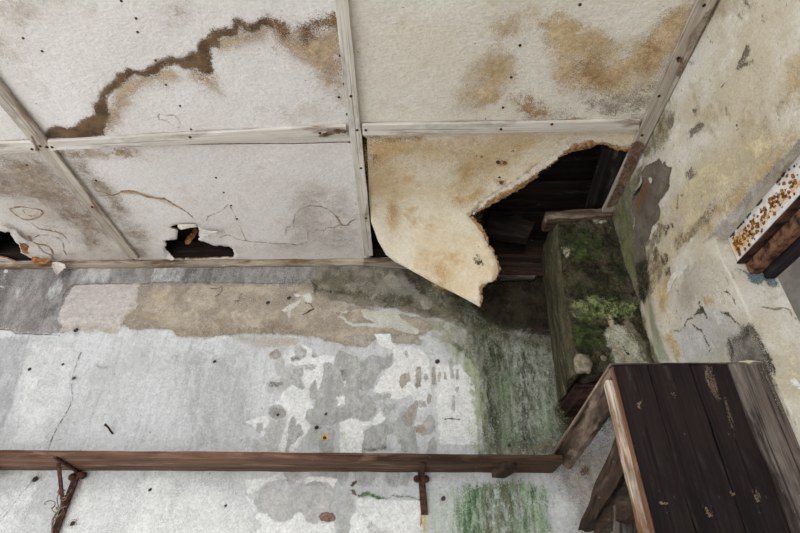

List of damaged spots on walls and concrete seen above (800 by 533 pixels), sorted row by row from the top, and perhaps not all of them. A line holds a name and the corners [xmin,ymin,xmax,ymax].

damp [44,0,346,139]
damp [444,0,695,120]
peeling [0,225,66,275]
peeling [178,224,218,238]
peeling [606,140,741,363]
peeling [252,333,437,454]
peeling [399,358,460,412]
damp [726,306,800,421]